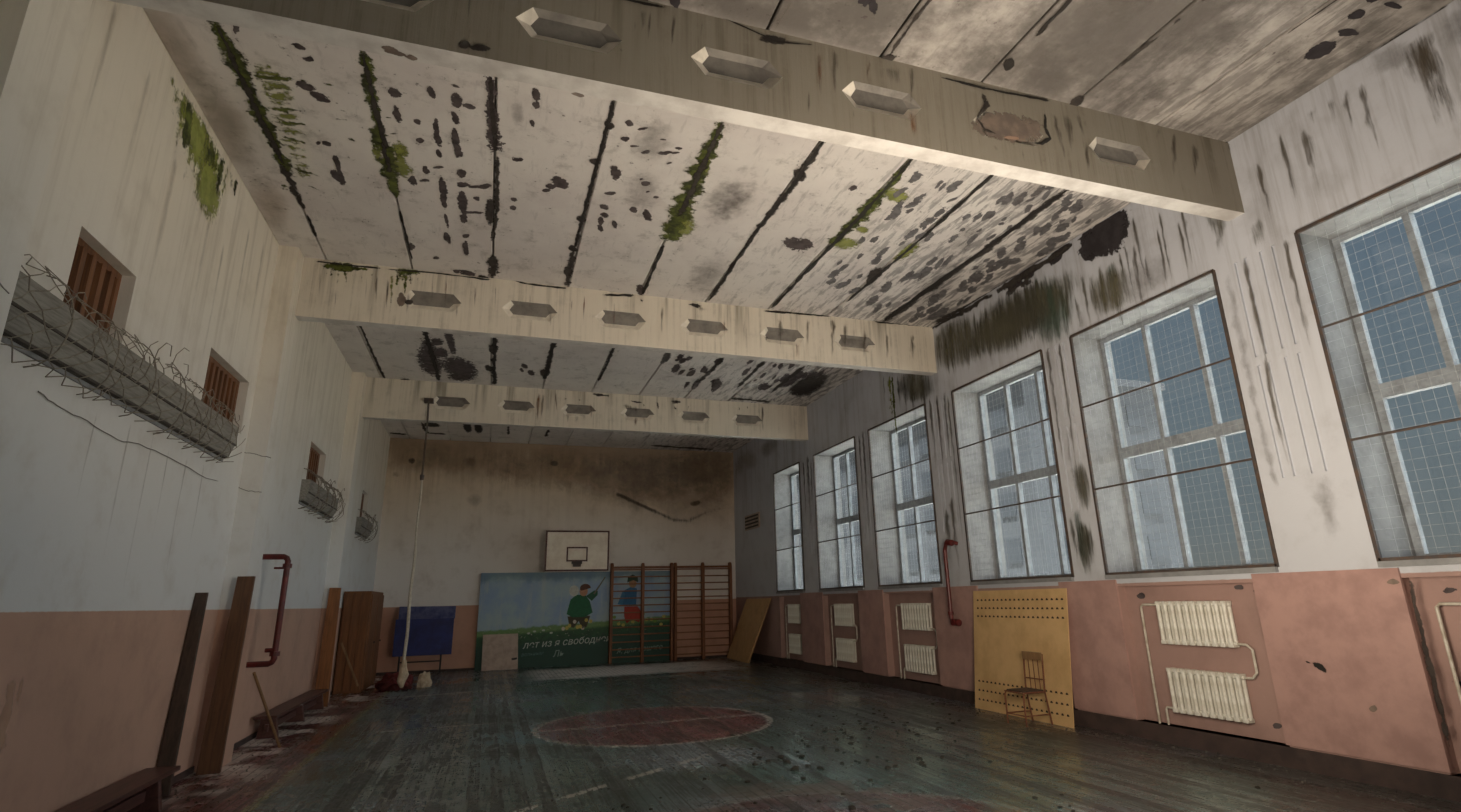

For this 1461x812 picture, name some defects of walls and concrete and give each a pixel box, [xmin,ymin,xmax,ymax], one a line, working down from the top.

leakage [175,95,238,196]
leakage [217,26,317,237]
leakage [361,55,400,198]
leakage [678,123,723,216]
leakage [781,237,813,251]
peeling [826,171,1133,323]
leakage [932,212,1187,337]